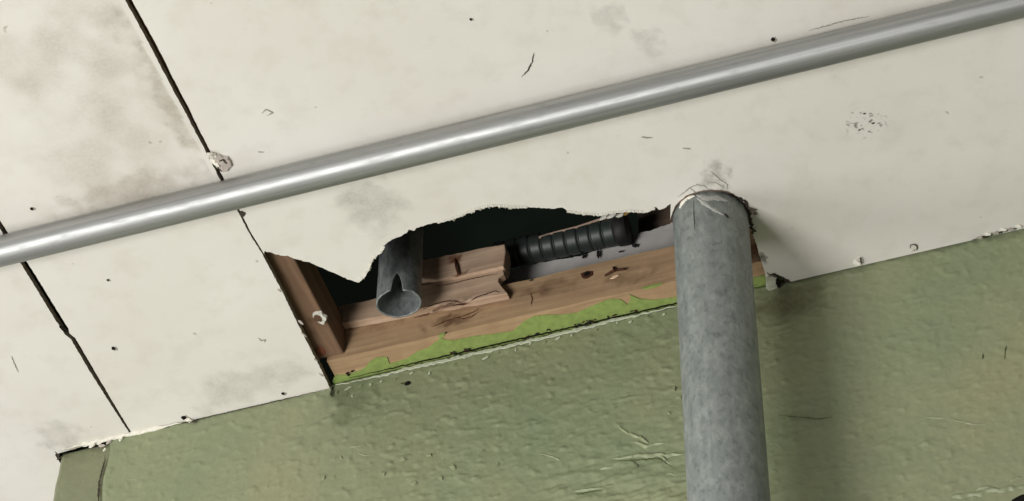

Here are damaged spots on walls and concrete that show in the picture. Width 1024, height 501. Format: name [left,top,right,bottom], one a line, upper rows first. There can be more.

crack [678,171,728,197]
peeling [335,305,677,397]
crack [623,458,671,467]